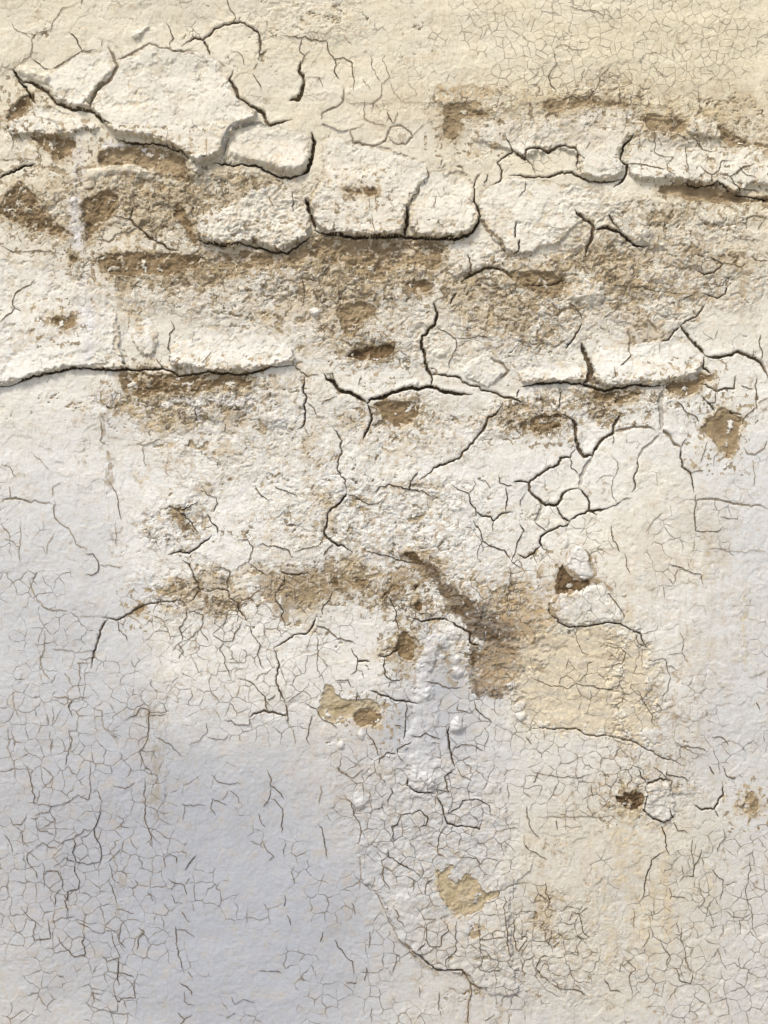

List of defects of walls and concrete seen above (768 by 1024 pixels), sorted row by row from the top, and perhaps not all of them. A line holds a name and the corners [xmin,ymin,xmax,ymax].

crack [0,0,768,257]
flaking render [0,26,768,408]
spalling [374,399,419,427]
spalling [701,408,742,458]
crack [0,256,768,863]
peeling [504,546,673,758]
crack [4,767,144,1012]
crack [374,810,433,935]
peeling [351,750,534,996]
crack [392,896,585,1024]
crack [524,727,757,993]
flaking render [616,782,676,820]